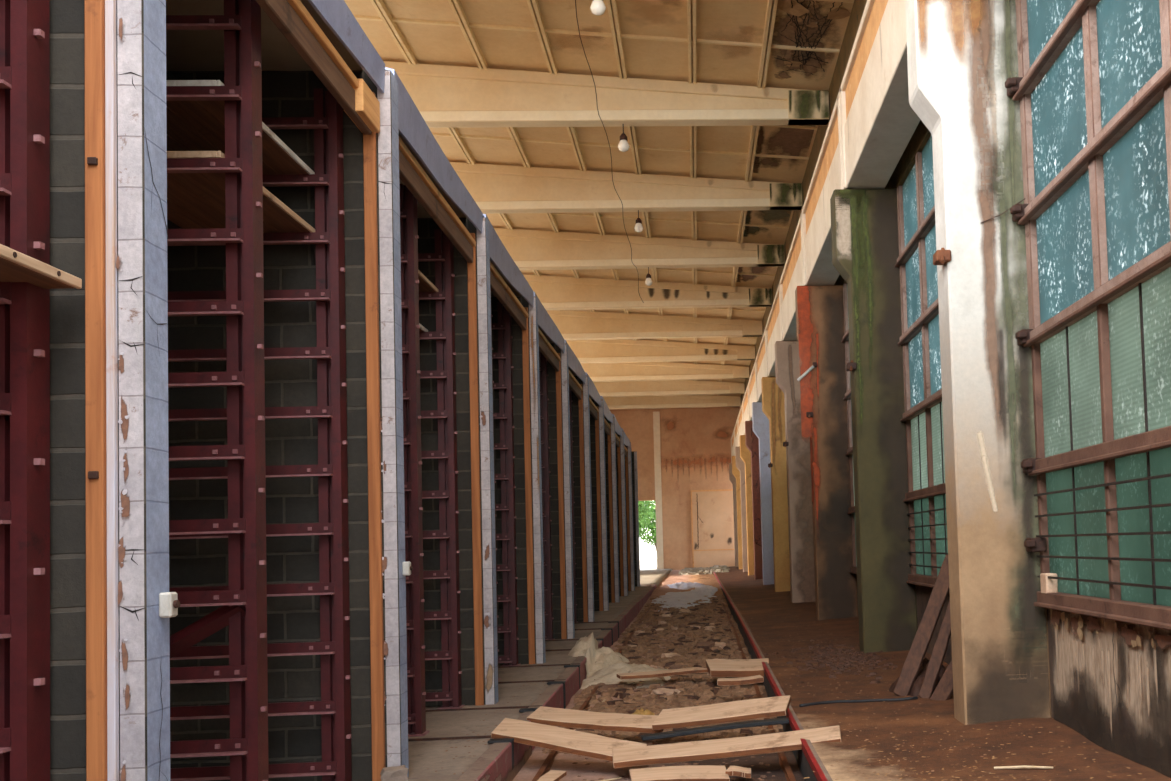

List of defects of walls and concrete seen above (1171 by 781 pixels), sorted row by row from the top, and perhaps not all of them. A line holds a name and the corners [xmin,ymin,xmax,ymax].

peeling [772,0,851,79]
leakage [788,194,915,652]
leakage [968,0,1034,538]
leakage [967,552,1171,778]